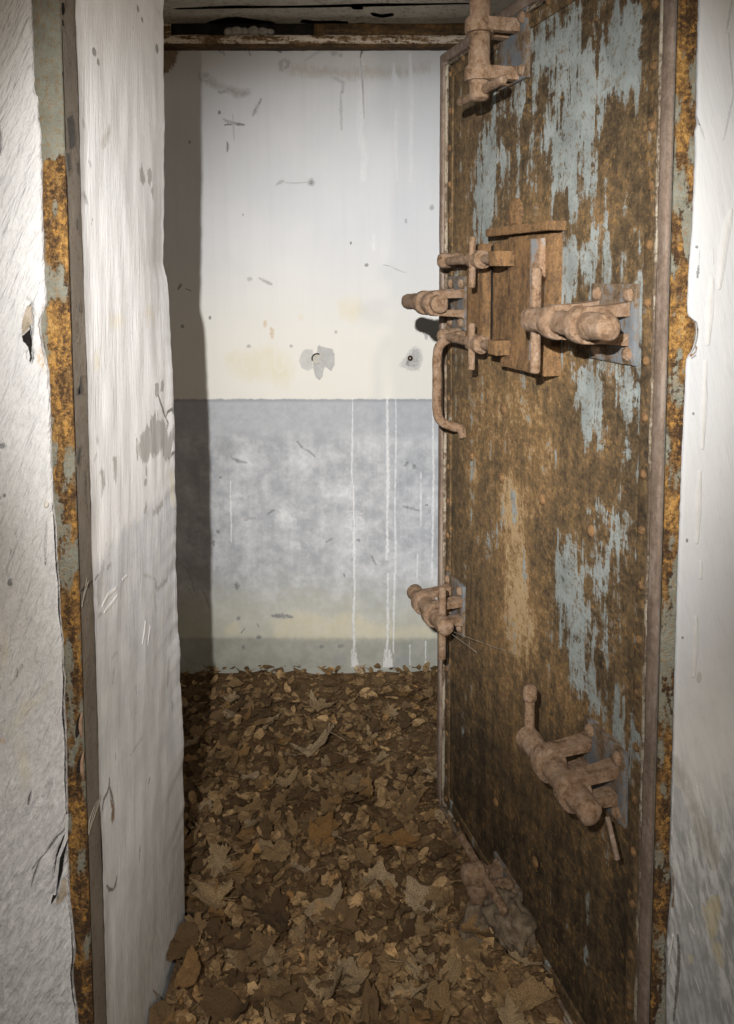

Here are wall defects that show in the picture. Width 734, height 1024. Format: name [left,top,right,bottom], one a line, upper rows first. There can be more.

peeling [21,313,41,363]
rust [32,313,48,378]
peeling [289,343,336,382]
peeling [398,329,429,373]
water stain [221,397,438,668]
crack [9,503,92,1023]